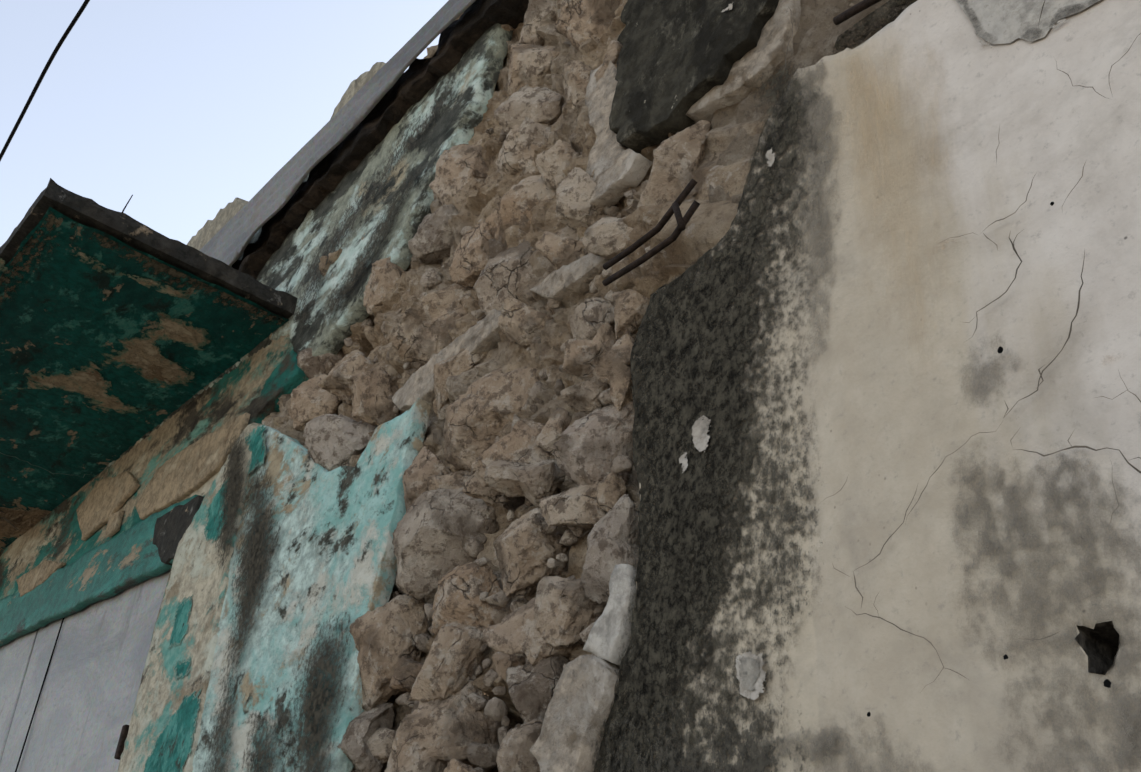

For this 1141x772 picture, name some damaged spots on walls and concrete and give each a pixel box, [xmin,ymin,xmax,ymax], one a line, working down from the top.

water stain [835,0,917,50]
peeling [955,0,1100,48]
crack [1056,33,1141,99]
water stain [0,211,74,313]
water stain [90,71,461,328]
spalling [0,0,907,772]
water stain [593,61,908,772]
crack [831,251,1141,693]
crack [940,177,1034,342]
mould [202,430,351,772]
water stain [970,467,1141,772]